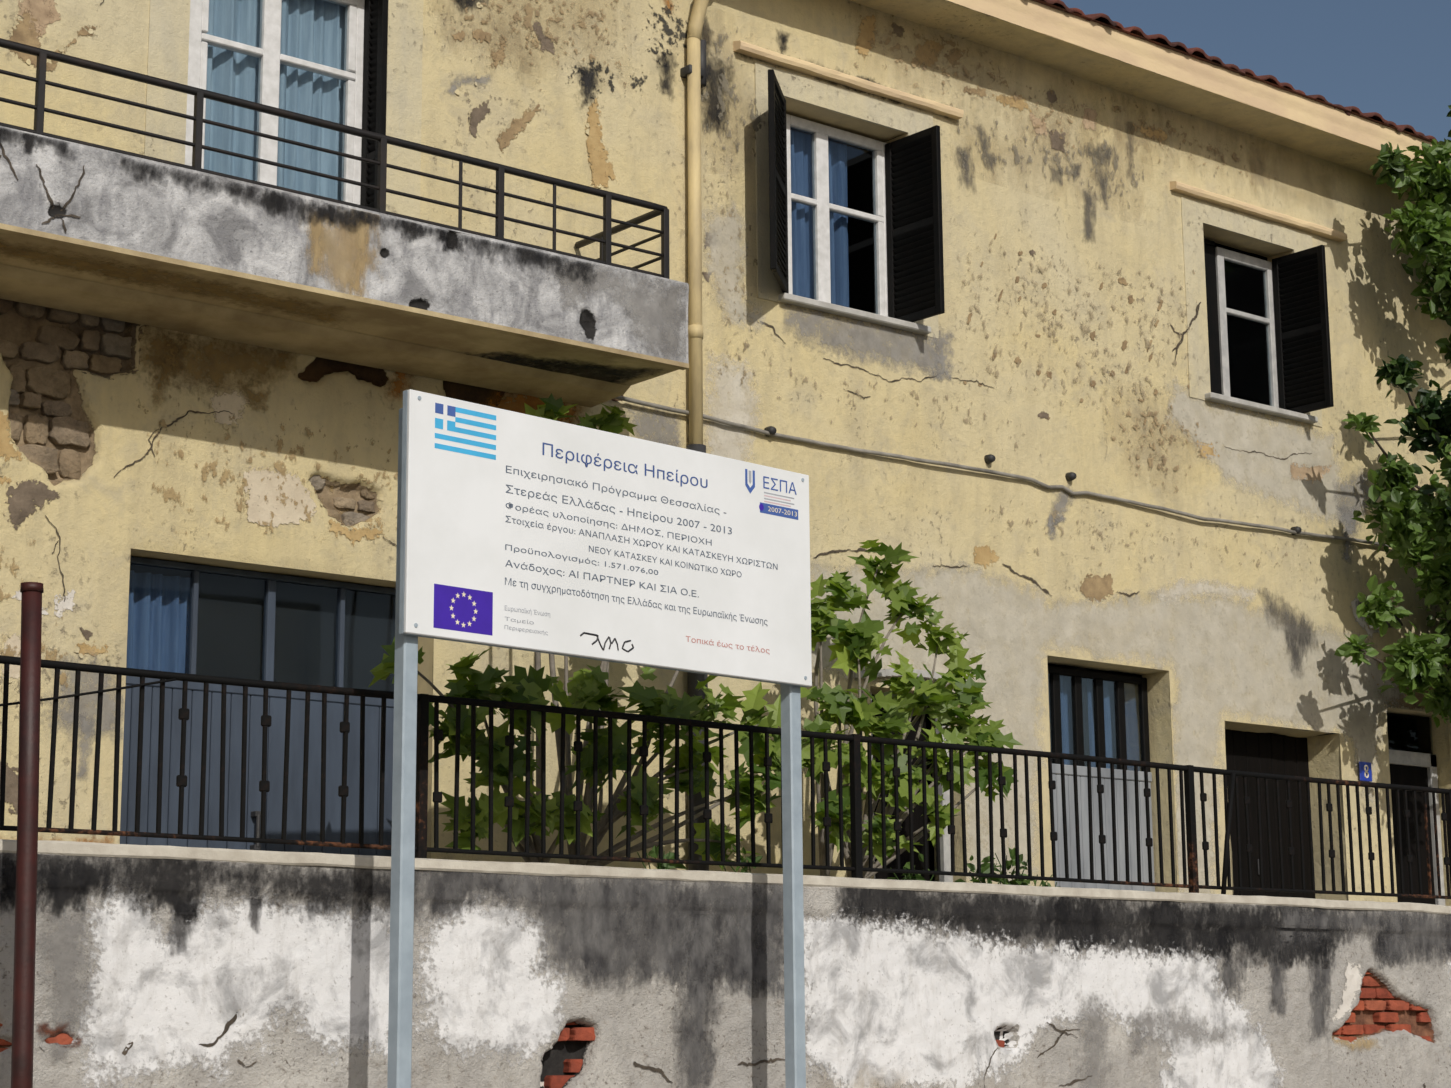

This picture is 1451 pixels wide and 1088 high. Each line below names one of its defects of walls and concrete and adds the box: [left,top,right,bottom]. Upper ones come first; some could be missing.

leakage [568,4,729,130]
crack [0,144,85,233]
leakage [1052,124,1133,238]
flaking render [0,299,143,530]
crack [114,410,233,477]
flaking render [138,385,398,546]
peeling [0,633,21,683]
leakage [37,837,391,1059]
flaking render [540,1022,600,1088]
leakage [414,870,784,1088]
leakage [839,888,1451,1036]
flaking render [1332,961,1443,1049]